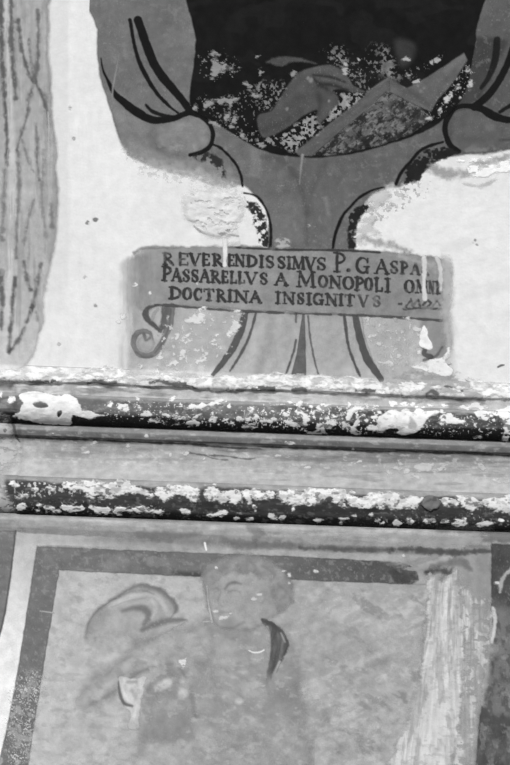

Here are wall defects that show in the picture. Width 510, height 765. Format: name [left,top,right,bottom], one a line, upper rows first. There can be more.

peeling [192,45,420,152]
peeling [425,65,475,120]
flaking render [429,157,510,186]
peeling [356,182,421,251]
flaking render [0,306,510,470]
peeling [386,460,446,479]
peeling [0,478,510,528]